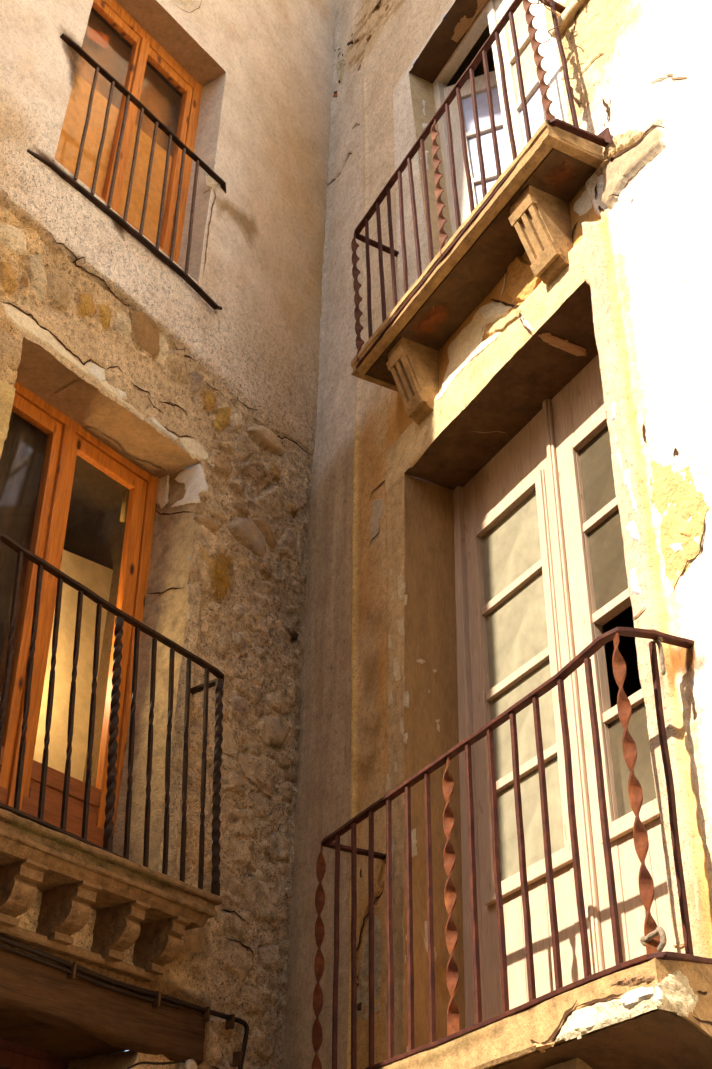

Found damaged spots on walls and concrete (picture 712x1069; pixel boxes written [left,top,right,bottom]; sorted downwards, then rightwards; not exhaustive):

peeling [451,0,489,42]
spalling [595,129,646,176]
flaking render [573,188,592,216]
flaking render [610,187,635,209]
flaking render [435,302,587,402]
peeling [615,434,641,542]
spalling [645,459,709,591]
peeling [629,567,641,595]
spalling [532,970,698,1053]